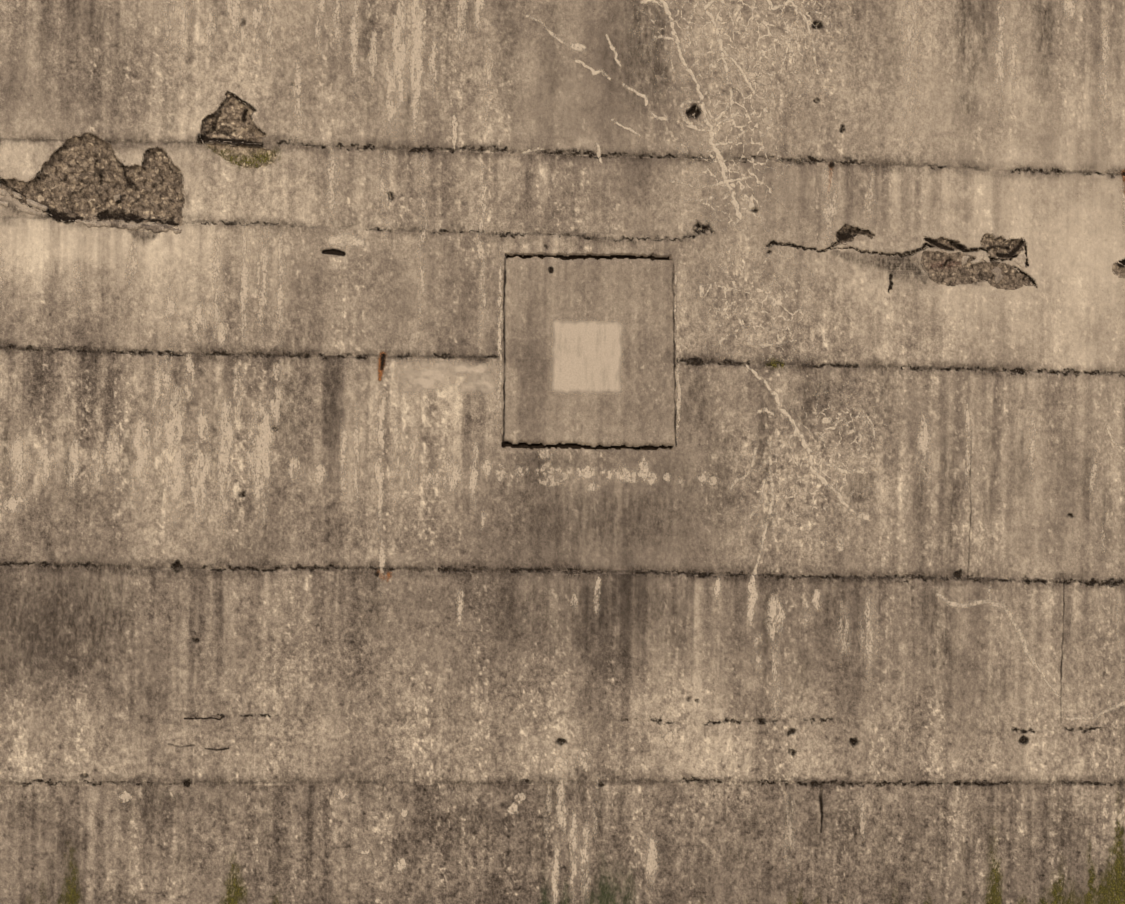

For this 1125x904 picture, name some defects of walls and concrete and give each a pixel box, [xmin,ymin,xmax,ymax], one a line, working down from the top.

leakage [315,0,438,135]
spalling [197,91,279,169]
spalling [0,132,185,240]
spalling [1112,259,1125,278]
leakage [3,224,289,525]
crack [0,345,367,359]
rust [378,352,386,381]
crack [201,0,1125,733]
leakage [374,388,683,526]
crack [0,561,129,572]
leakage [747,575,786,716]
crack [761,778,1010,832]